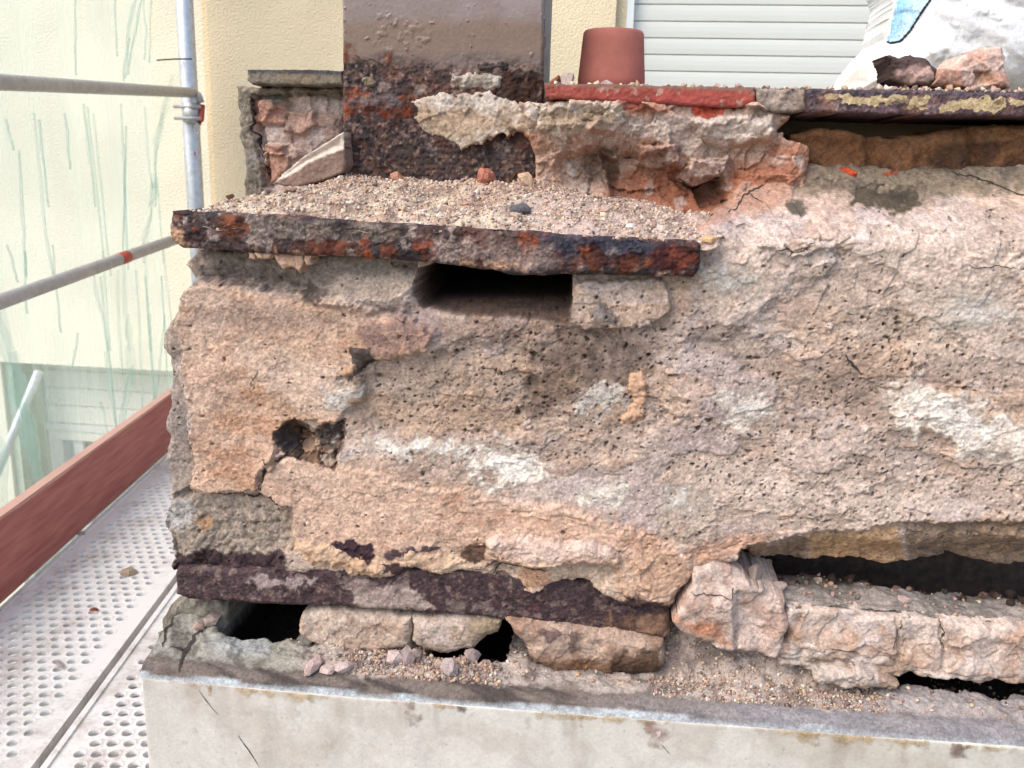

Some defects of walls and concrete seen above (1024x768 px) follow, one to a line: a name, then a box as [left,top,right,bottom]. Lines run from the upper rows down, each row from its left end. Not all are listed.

rust [490,68,539,103]
spalling [519,99,809,214]
crack [728,185,763,212]
rust [307,239,356,255]
rust [577,242,699,276]
peeling [300,435,337,466]
rust [172,549,286,574]
rust [331,539,439,575]
spalling [736,557,788,592]
rust [621,596,668,610]
spalling [193,612,221,631]
crack [162,615,206,672]